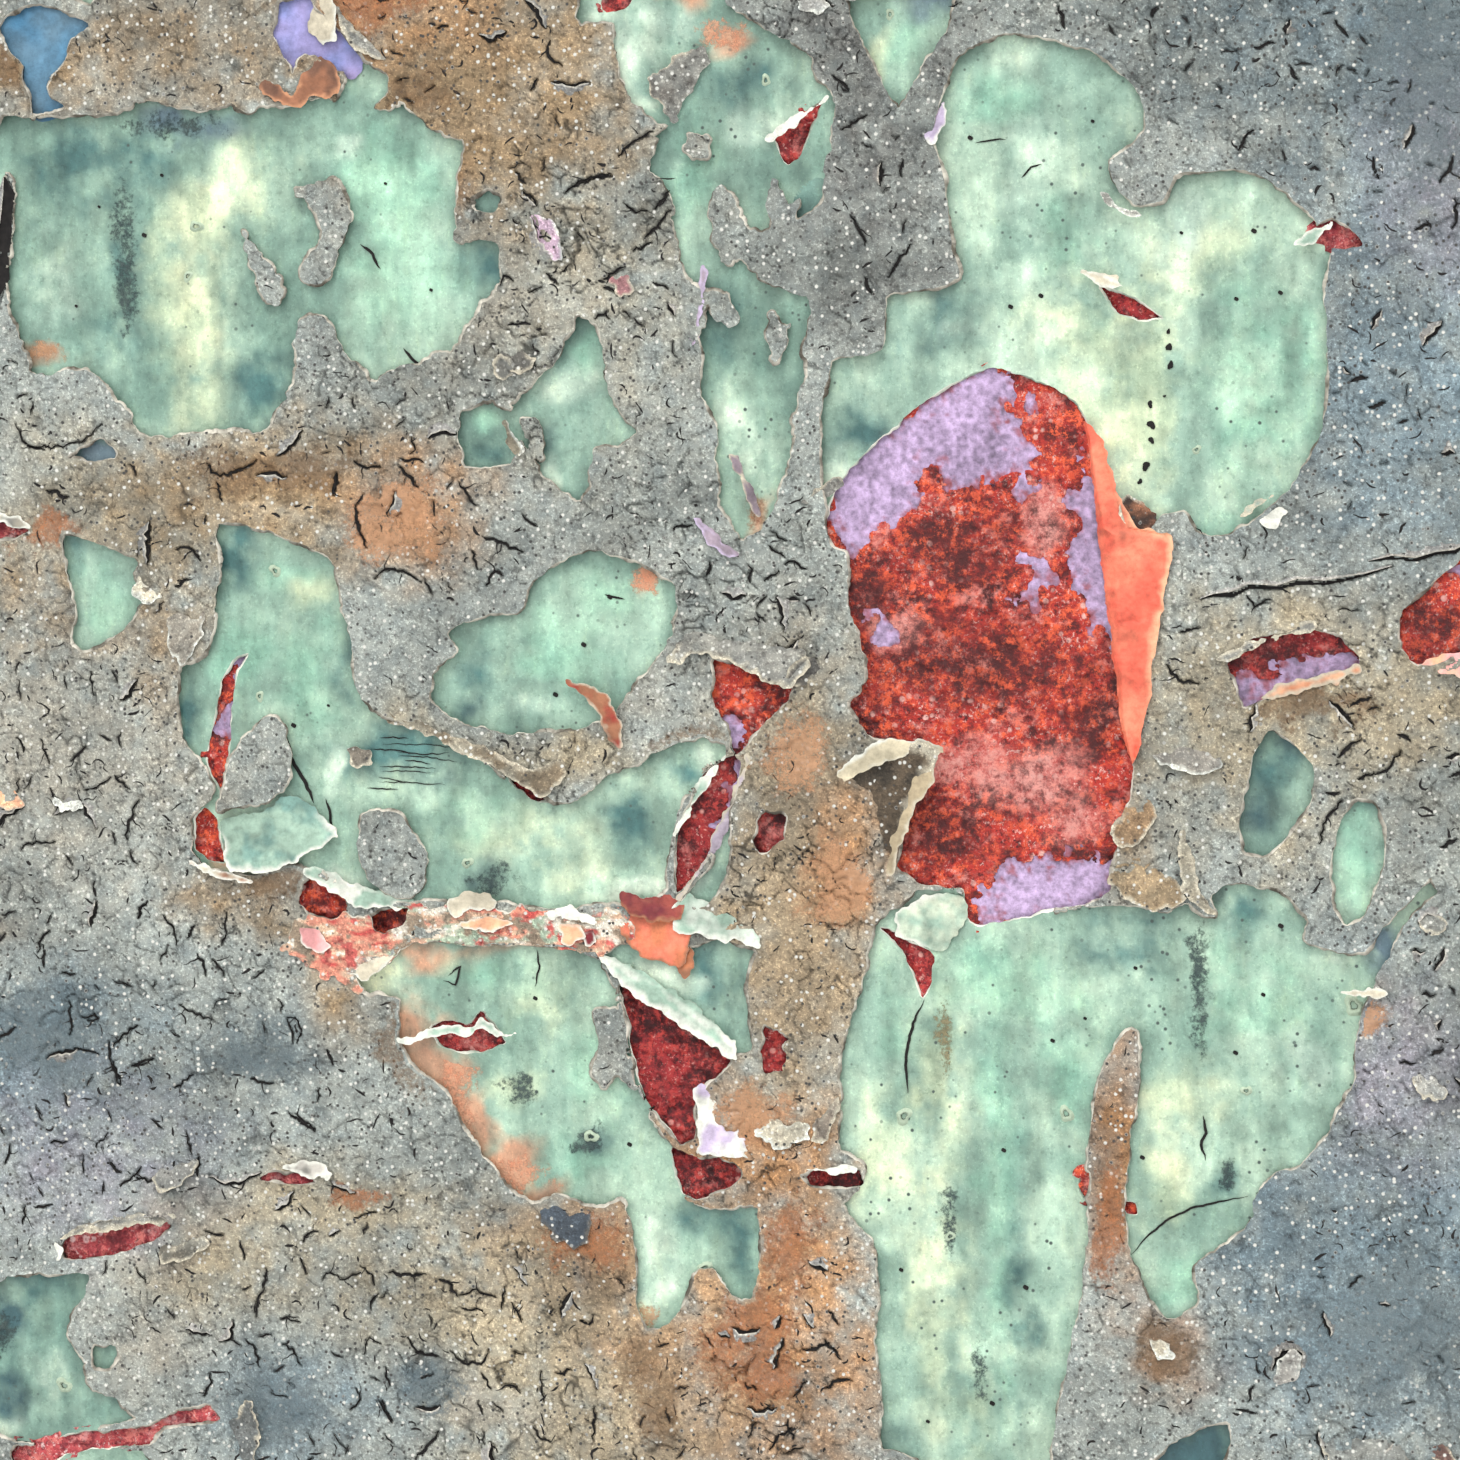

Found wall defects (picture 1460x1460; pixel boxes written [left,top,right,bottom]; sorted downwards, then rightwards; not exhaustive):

crack [75,33,176,96]
peeling [0,0,500,438]
crack [0,348,538,613]
rust [596,0,632,13]
rust [666,362,1173,933]
peeling [821,35,1331,536]
crack [1055,0,1460,894]
peeling [166,524,761,1328]
rust [789,1164,863,1188]
peeling [754,799,1448,1460]
rust [1073,1165,1137,1279]
crack [1120,1386,1192,1438]